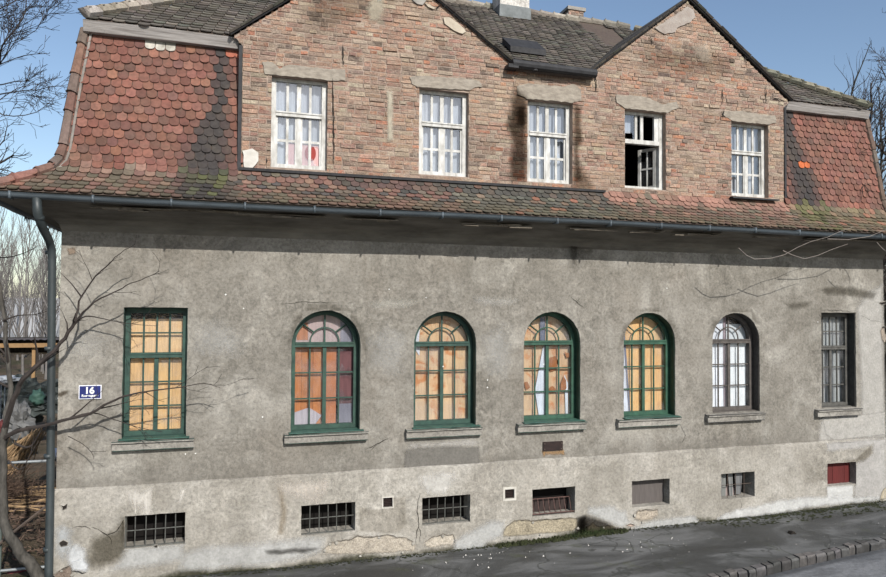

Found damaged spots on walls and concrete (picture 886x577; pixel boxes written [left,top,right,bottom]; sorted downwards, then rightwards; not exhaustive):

peeling [503,517,586,539]
peeling [323,533,456,557]
peeling [53,545,88,577]